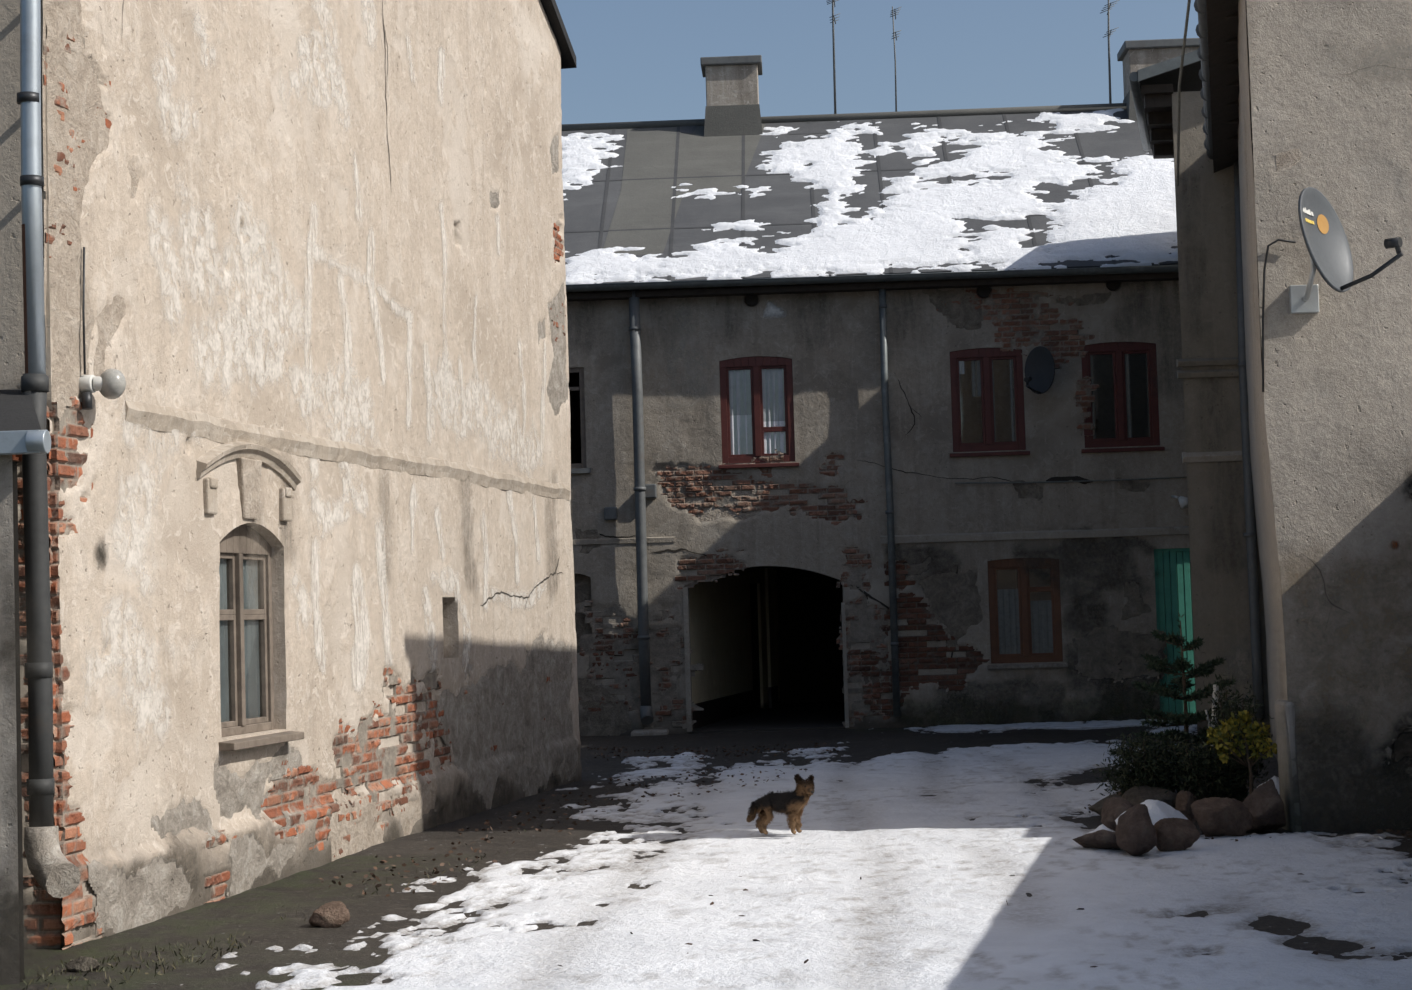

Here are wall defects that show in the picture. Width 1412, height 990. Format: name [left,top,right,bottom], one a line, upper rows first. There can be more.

crack [382,1,391,175]
damp [149,155,546,476]
flaking render [922,287,1111,369]
flaking render [23,0,704,950]
flaking render [652,449,868,525]
flaking render [12,454,29,822]
crack [480,559,562,611]
flaking render [842,547,990,719]
damp [1289,561,1412,833]